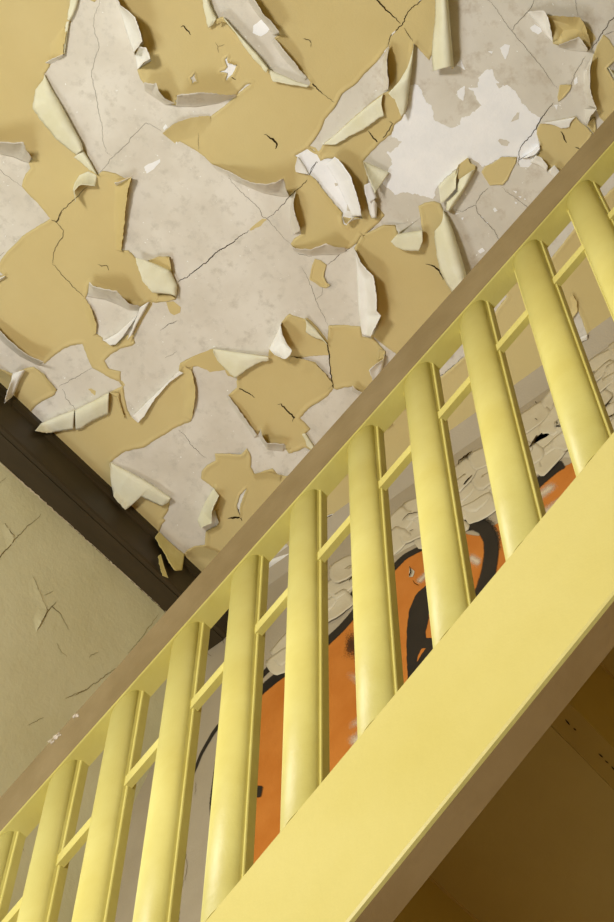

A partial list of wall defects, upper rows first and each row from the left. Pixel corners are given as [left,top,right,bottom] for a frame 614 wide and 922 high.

peeling [0,0,614,578]
crack [0,514,41,557]
flaking render [0,463,166,612]
crack [27,577,68,654]
peeling [266,633,286,675]
peeling [328,554,353,623]